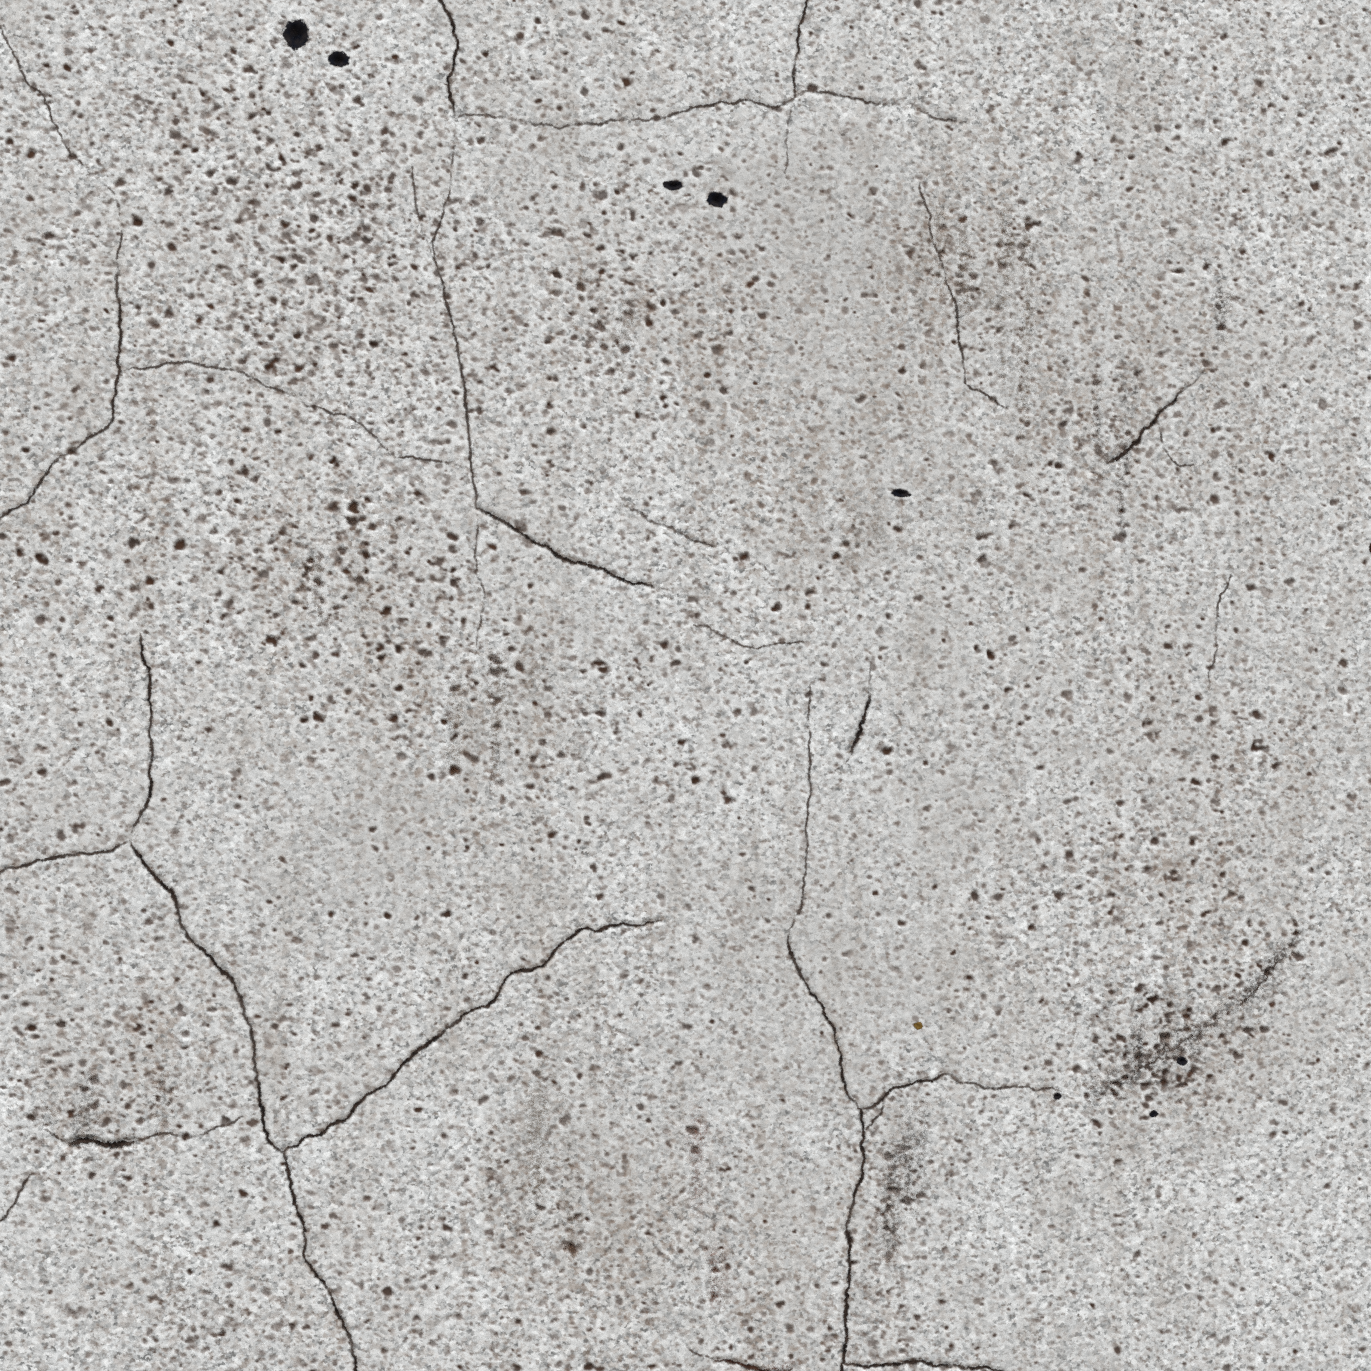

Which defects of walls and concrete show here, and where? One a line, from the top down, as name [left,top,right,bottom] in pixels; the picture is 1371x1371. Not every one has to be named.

crack [438,0,967,173]
crack [0,26,668,645]
crack [918,184,1008,409]
crack [1106,370,1205,467]
crack [630,508,715,547]
crack [693,624,805,649]
crack [1208,575,1231,681]
crack [0,633,662,1371]
crack [787,661,1062,1371]
crack [1133,1032,1201,1075]
crack [1240,946,1291,1006]
crack [689,1349,793,1371]